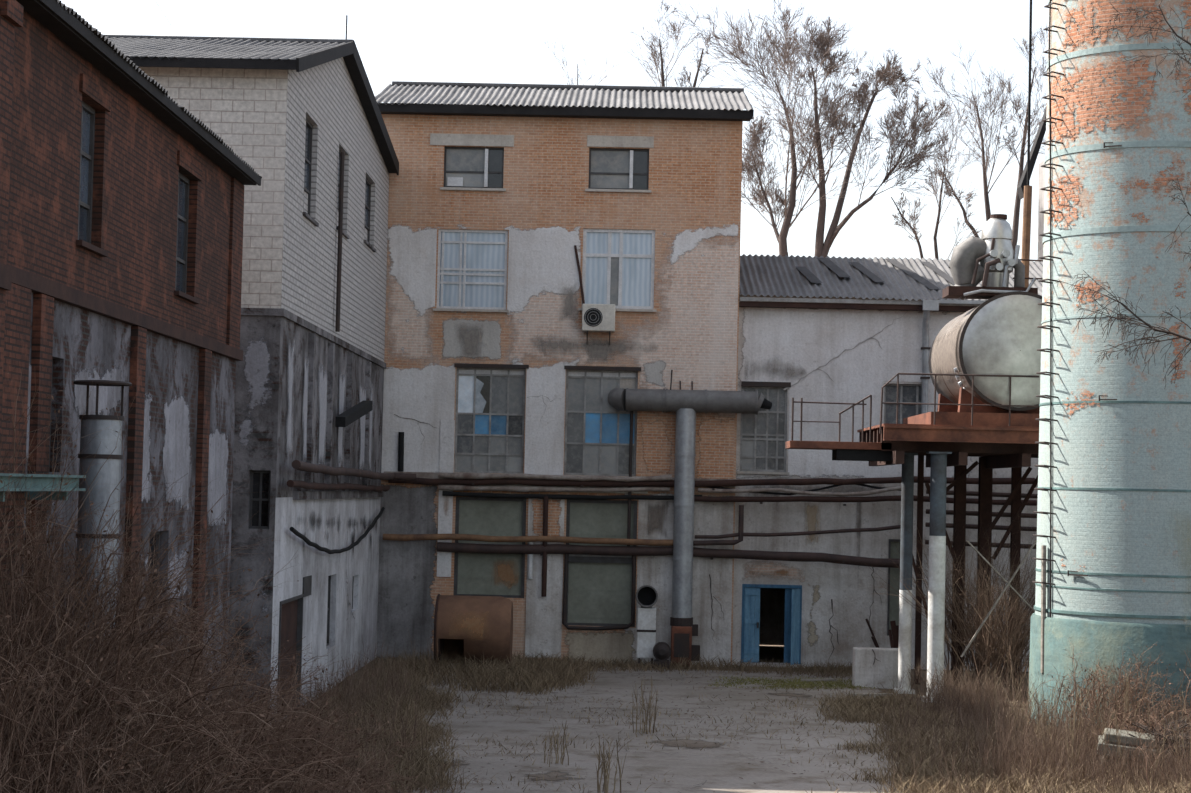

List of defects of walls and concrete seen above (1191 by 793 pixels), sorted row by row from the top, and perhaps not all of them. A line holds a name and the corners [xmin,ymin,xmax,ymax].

peeling [1047,0,1191,232]
peeling [74,364,121,415]
peeling [142,392,192,512]
peeling [207,339,272,532]
damp [287,347,345,467]
damp [359,389,373,469]
damp [538,339,633,359]
peeling [504,223,964,479]
crack [783,314,905,390]
spalling [532,499,562,536]
peeling [565,492,674,664]
peeling [691,496,821,667]